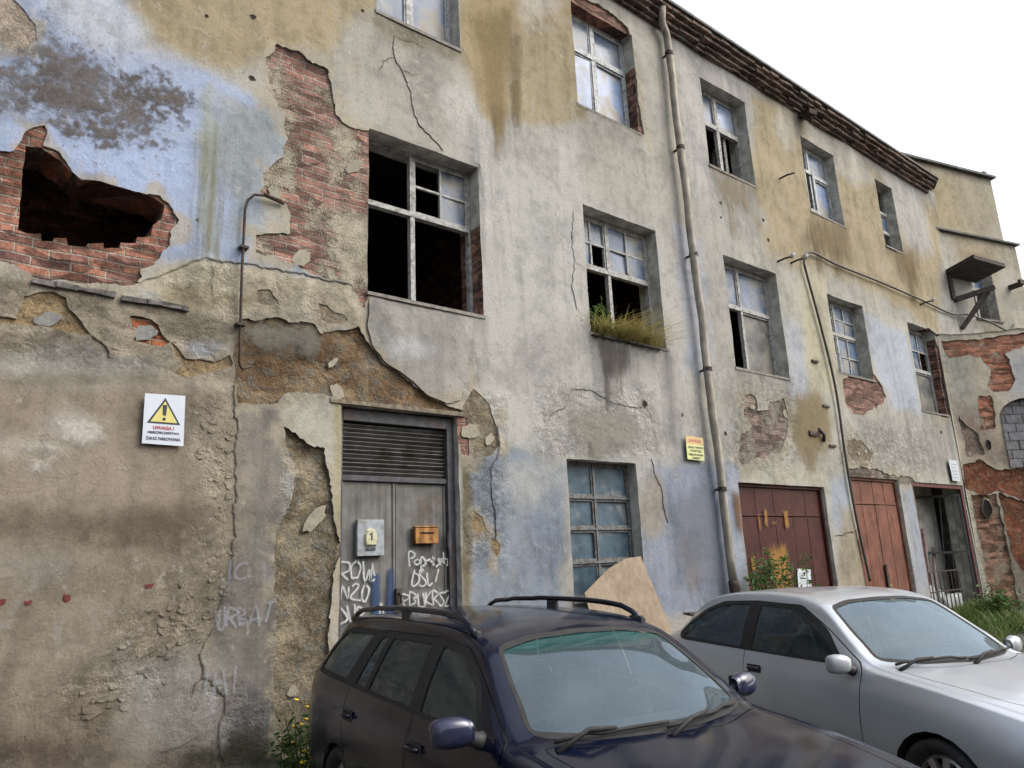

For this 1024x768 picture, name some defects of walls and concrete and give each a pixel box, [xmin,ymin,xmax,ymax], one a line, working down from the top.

flaking render [0,0,191,335]
flaking render [248,44,369,308]
crack [381,35,444,151]
crack [570,212,578,310]
crack [159,384,241,765]
flaking render [273,427,340,768]
flaking render [130,289,499,457]
flaking render [471,509,501,557]
crack [540,387,669,522]
flaking render [738,394,789,468]
flaking render [843,374,886,416]
flaking render [926,328,1024,607]